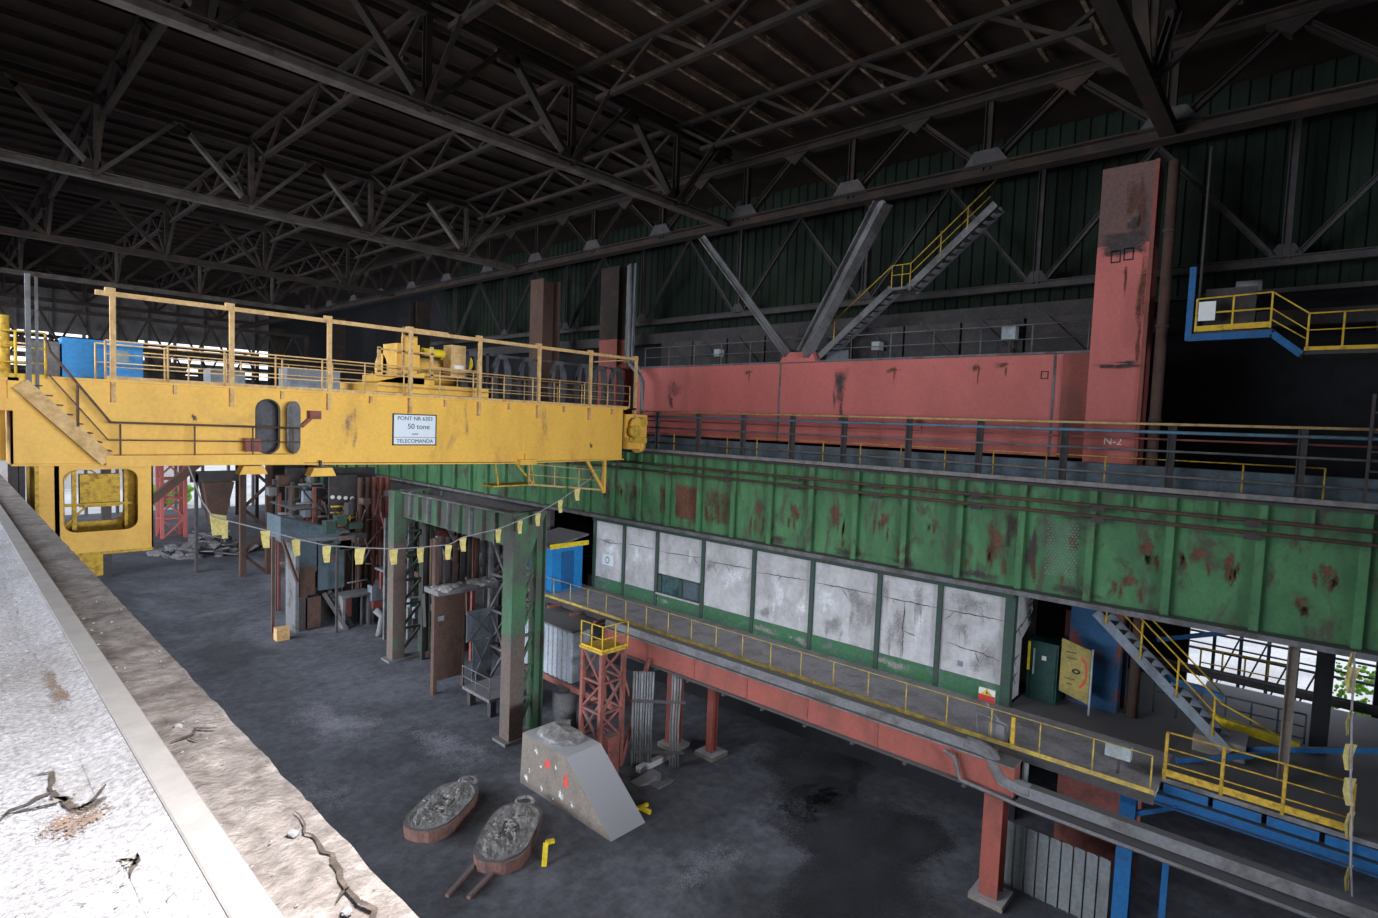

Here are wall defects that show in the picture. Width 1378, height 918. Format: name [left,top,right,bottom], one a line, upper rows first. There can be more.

rust [1122,176,1150,363]
crack [600,539,1029,666]
rust [829,503,845,538]
rust [984,518,1007,579]
rust [1111,538,1160,603]
rust [1179,545,1241,586]
rust [1291,559,1340,620]